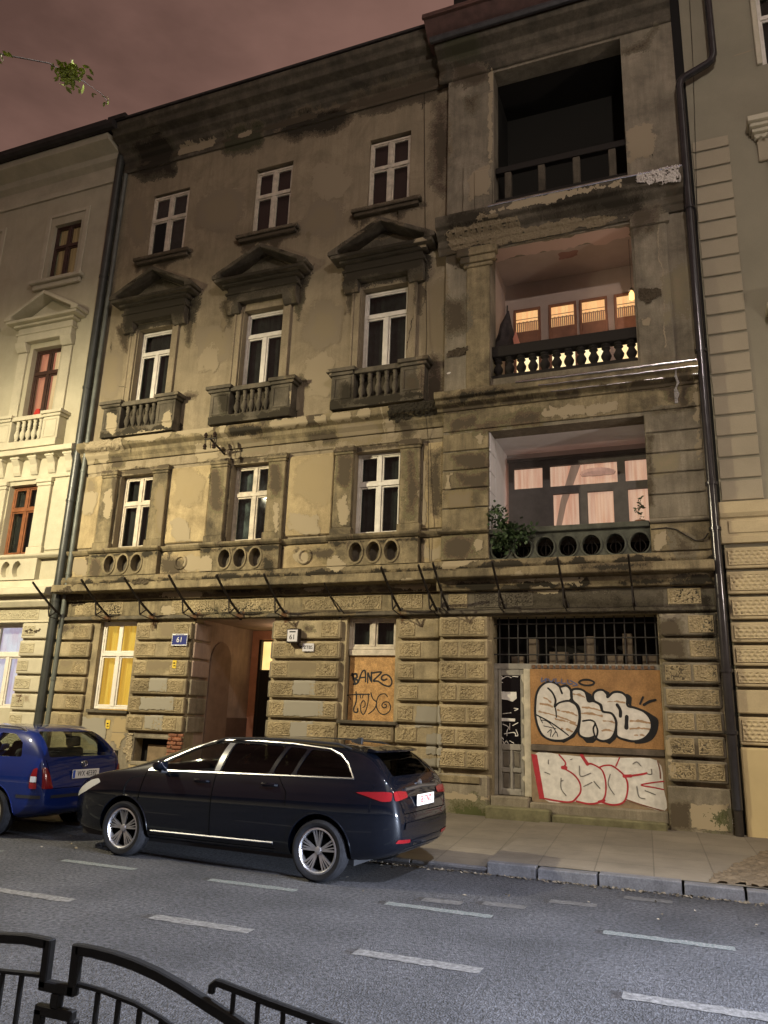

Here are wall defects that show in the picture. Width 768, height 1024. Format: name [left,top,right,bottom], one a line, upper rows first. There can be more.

peeling [178,136,217,156]
peeling [626,123,681,185]
spalling [414,179,630,263]
spalling [638,287,662,304]
water stain [63,32,738,707]
peeling [541,401,618,420]
peeling [273,502,321,537]